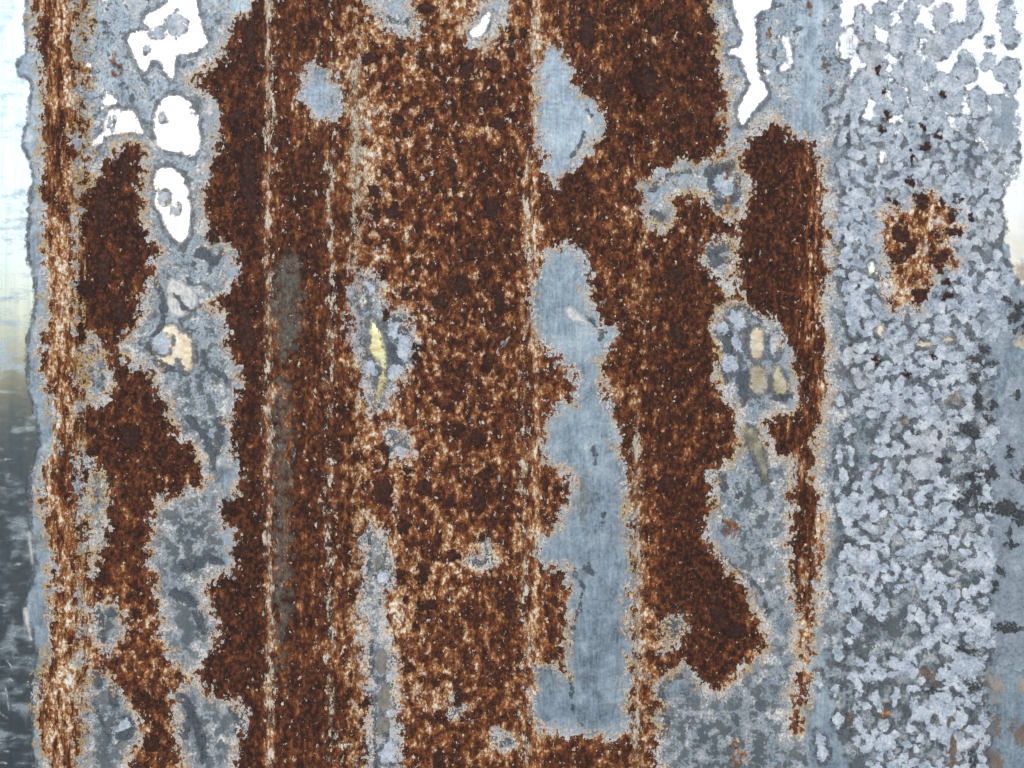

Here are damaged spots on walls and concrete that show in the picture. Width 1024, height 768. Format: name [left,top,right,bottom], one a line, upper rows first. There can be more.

rust [97,0,159,32]
peeling [724,0,795,129]
rust [757,0,802,68]
rust [762,63,801,112]
peeling [90,0,212,247]
peeling [836,0,1024,352]
rust [844,752,864,768]